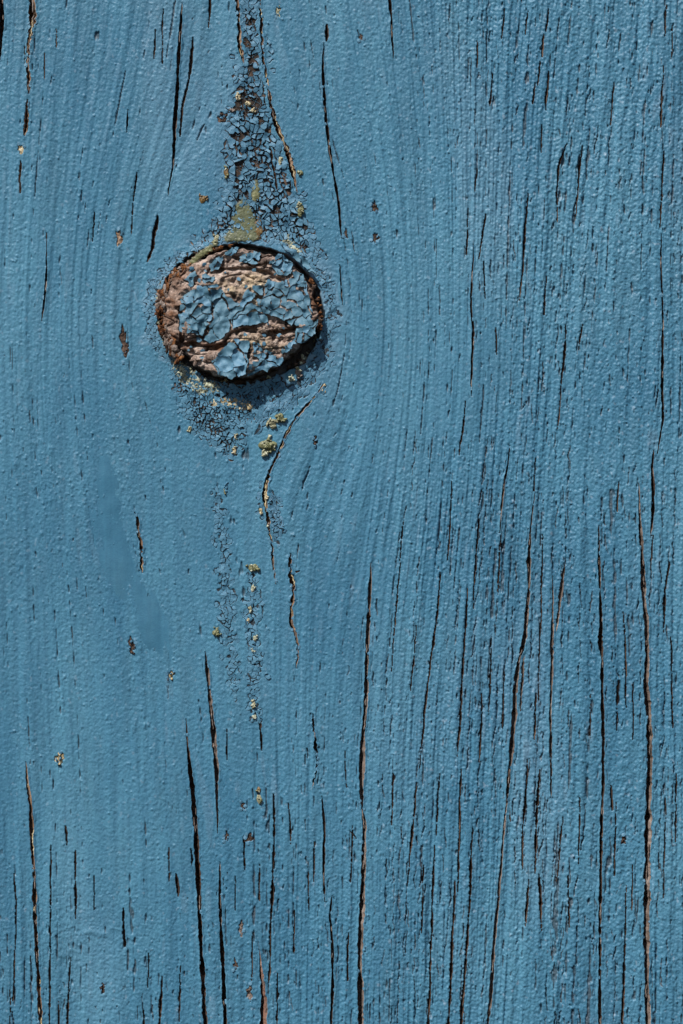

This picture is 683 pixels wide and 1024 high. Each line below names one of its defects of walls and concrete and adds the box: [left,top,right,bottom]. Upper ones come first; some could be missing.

peeling [178,242,318,379]
crack [131,0,677,1024]
crack [9,762,95,1024]